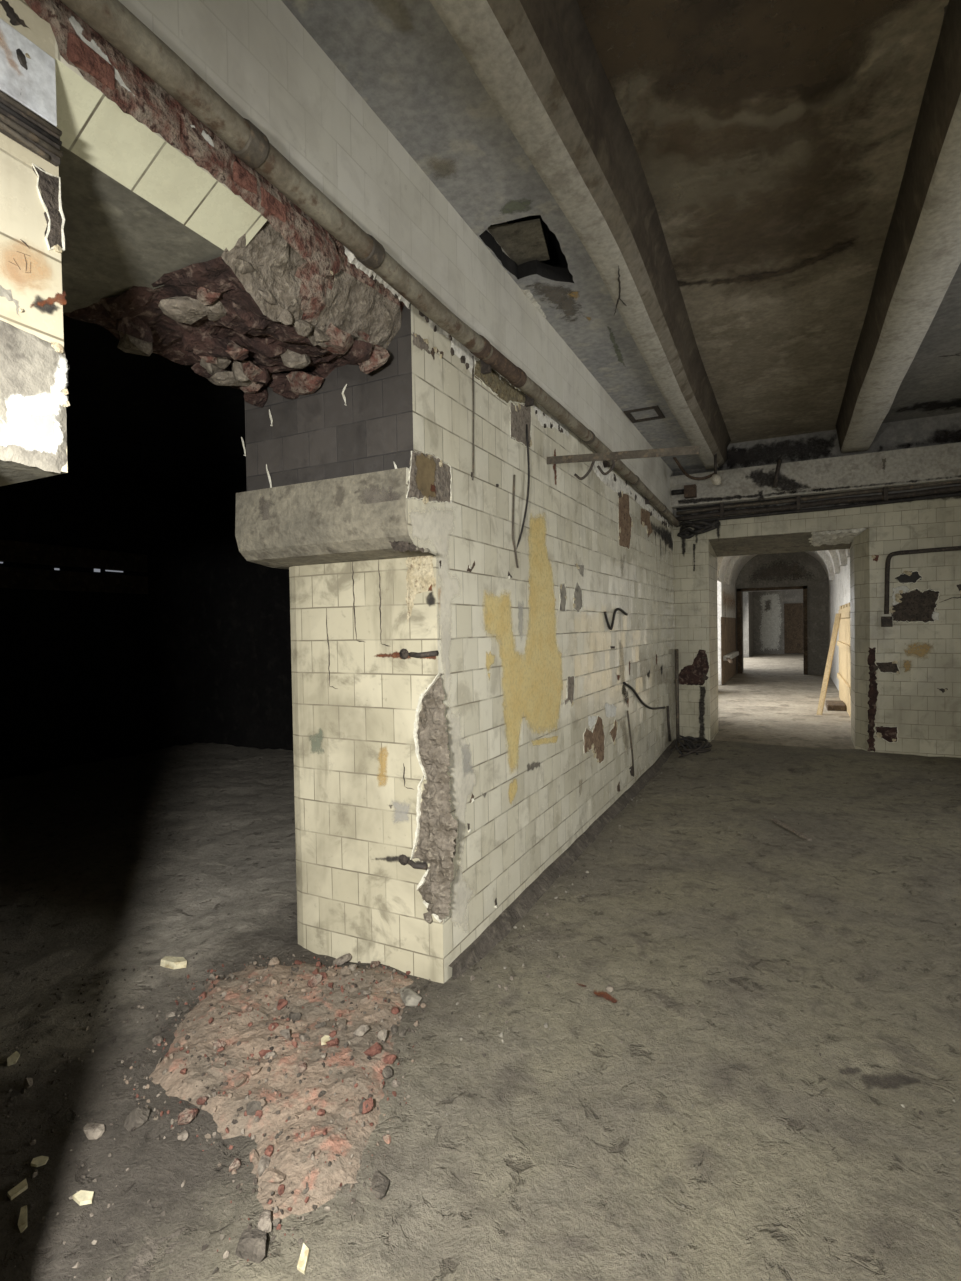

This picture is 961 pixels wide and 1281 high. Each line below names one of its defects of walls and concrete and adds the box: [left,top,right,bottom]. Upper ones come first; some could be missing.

leakage [577,0,912,286]
spalling [0,0,569,473]
leakage [501,199,531,213]
peeling [591,461,670,550]
peeling [889,570,940,623]
spalling [679,650,709,686]
peeling [583,702,618,764]
spalling [410,673,471,924]